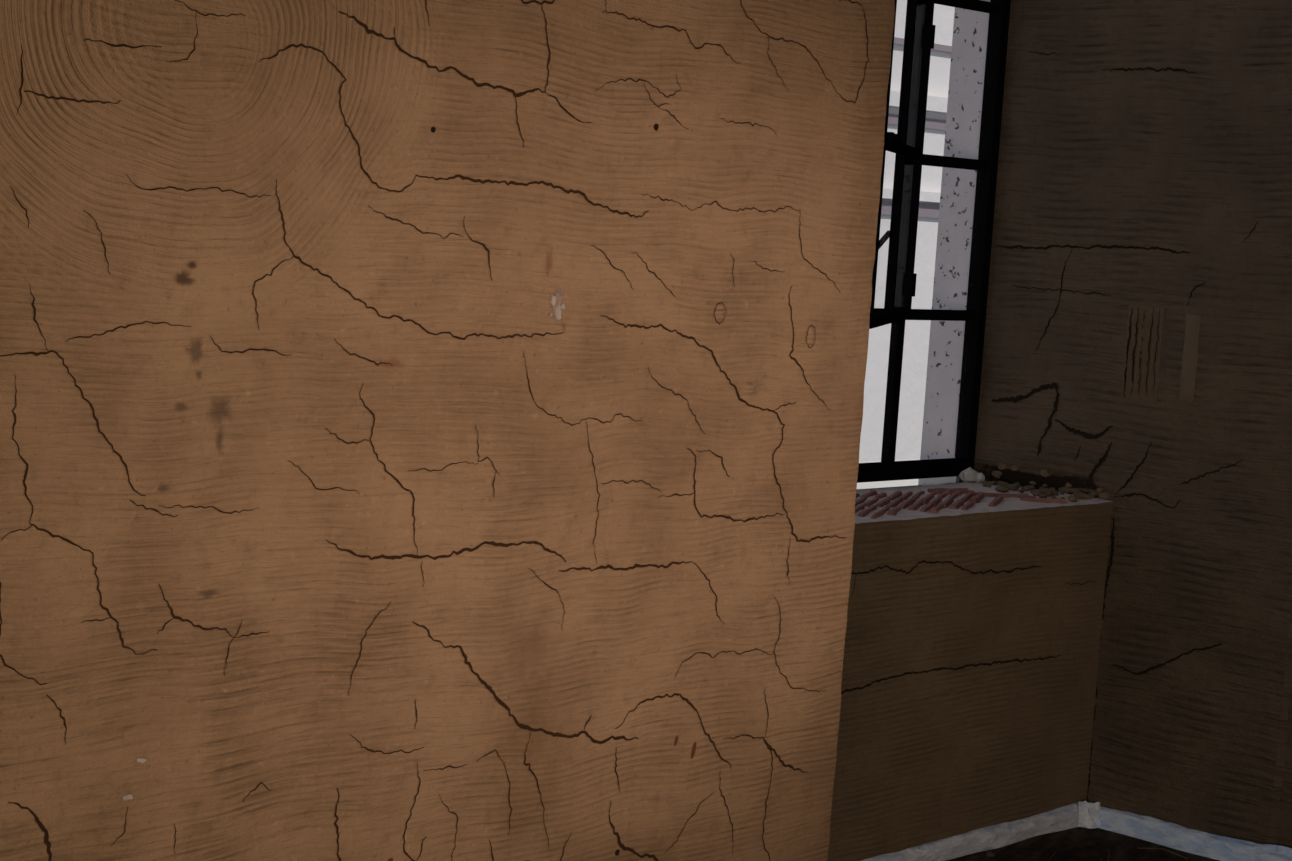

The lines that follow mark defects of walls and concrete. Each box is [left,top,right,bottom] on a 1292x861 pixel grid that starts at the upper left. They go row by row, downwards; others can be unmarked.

crack [84,0,246,62]
crack [339,0,592,148]
crack [602,0,869,103]
crack [996,244,1190,354]
crack [0,43,1061,861]
crack [851,383,1242,799]